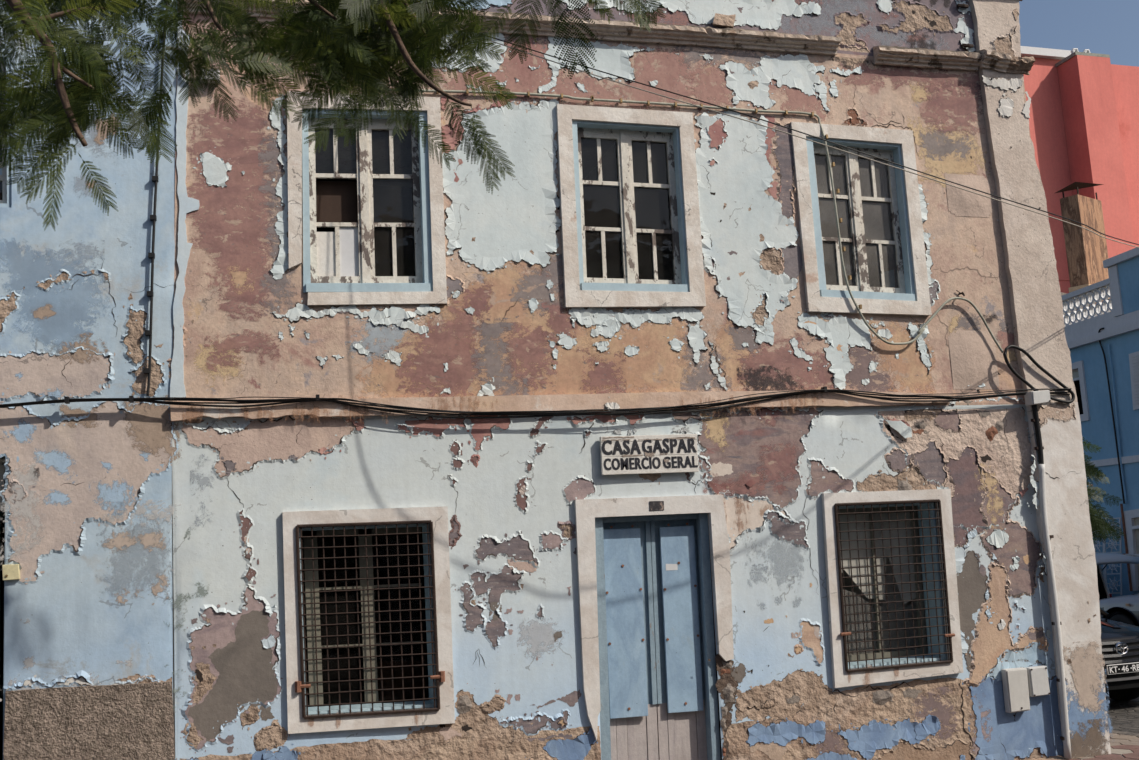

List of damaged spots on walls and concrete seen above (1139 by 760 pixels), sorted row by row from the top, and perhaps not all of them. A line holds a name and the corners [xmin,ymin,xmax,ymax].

flaking render [989,8,1019,57]
peeling [186,0,983,399]
flaking render [0,268,111,336]
flaking render [0,292,366,584]
peeling [395,414,513,550]
peeling [513,402,651,515]
flaking render [638,473,664,486]
peeling [0,657,172,702]
flaking render [175,508,305,760]
flaking render [403,683,598,760]
peeling [455,521,577,650]
flaking render [670,389,1113,760]